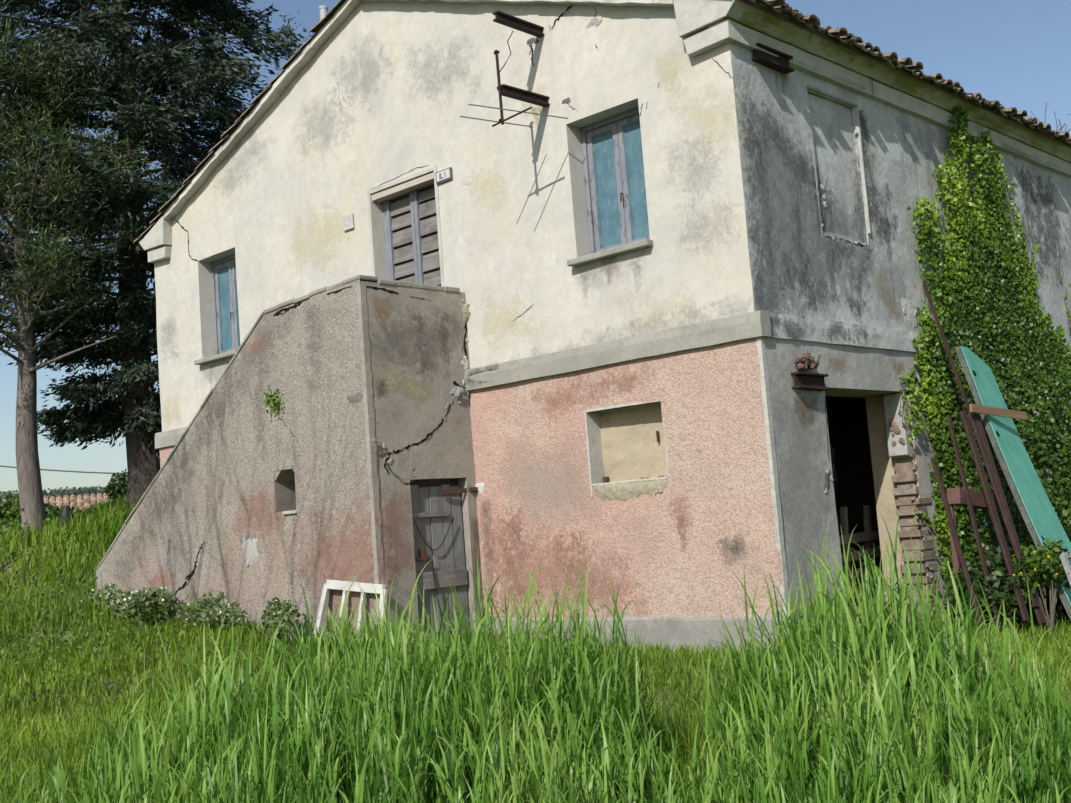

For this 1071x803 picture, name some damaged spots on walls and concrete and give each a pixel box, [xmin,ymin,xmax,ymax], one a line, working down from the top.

damp [739,91,899,344]
damp [1011,164,1067,286]
crack [384,322,469,485]
crack [167,539,204,597]